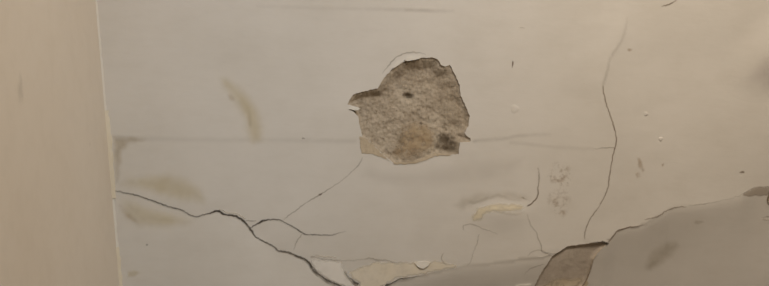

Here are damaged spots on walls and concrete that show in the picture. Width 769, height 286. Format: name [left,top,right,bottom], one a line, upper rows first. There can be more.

spalling [348,56,471,164]
spalling [744,187,769,204]
crack [127,193,341,286]
peeling [312,260,455,286]
spalling [516,241,608,286]